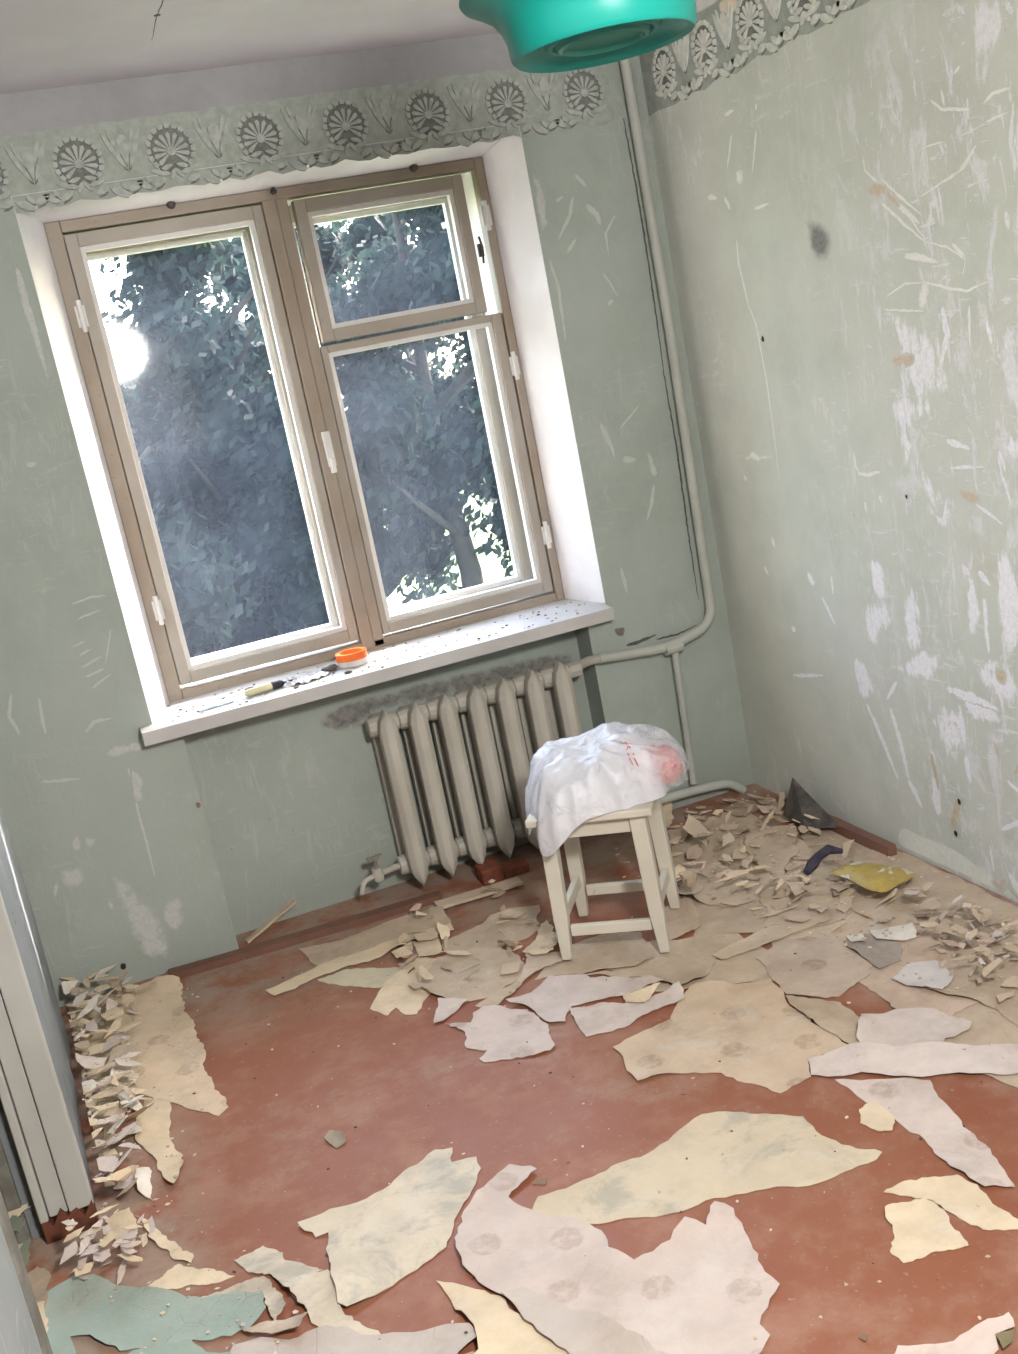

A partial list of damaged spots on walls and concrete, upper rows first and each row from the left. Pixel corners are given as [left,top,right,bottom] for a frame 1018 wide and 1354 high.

peeling [953,0,1015,75]
peeling [736,240,779,482]
peeling [863,86,1018,533]
peeling [852,542,1018,818]